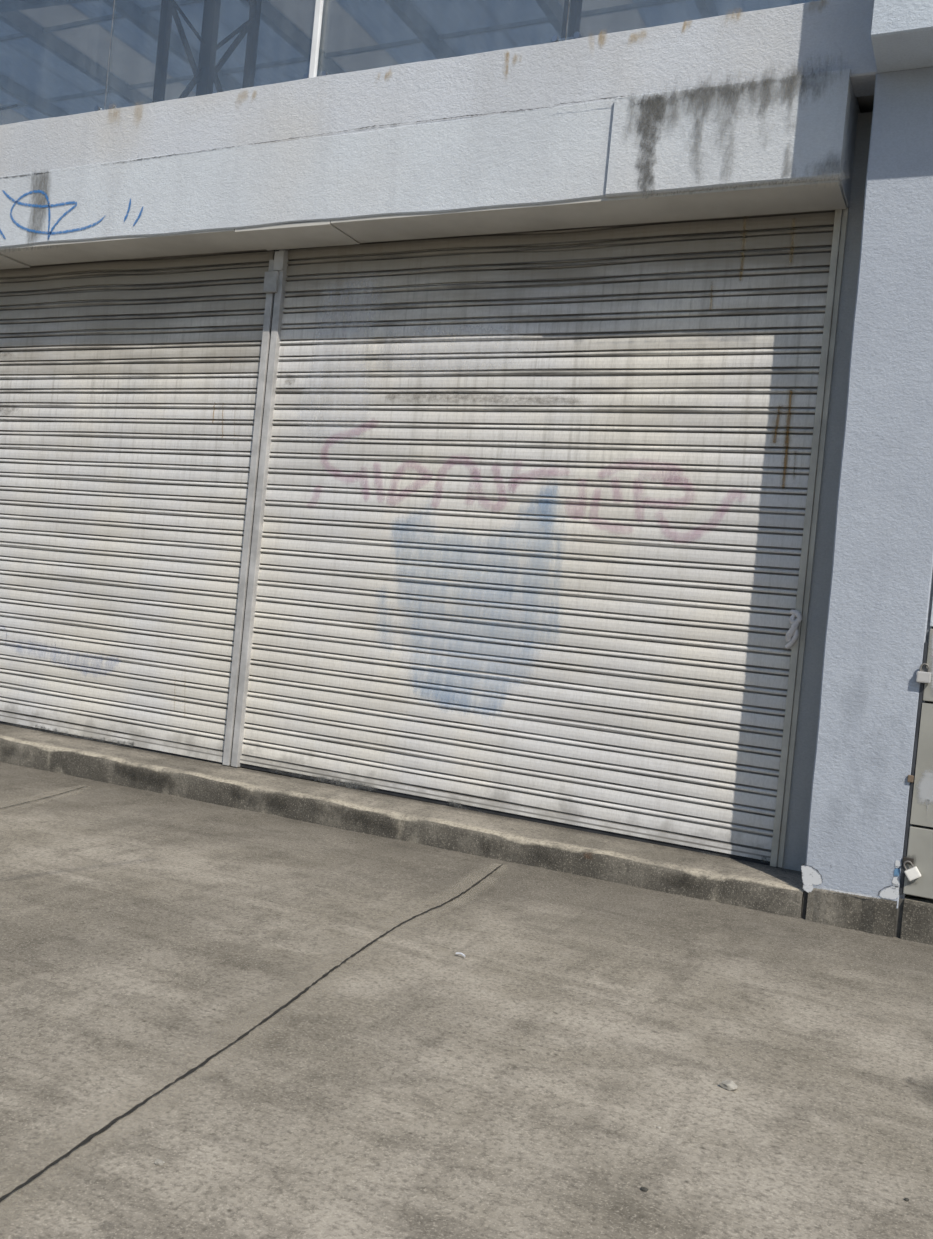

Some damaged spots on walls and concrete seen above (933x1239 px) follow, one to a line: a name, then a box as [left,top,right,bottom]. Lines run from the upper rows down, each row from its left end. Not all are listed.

damp [637,72,806,195]
rust [774,391,792,485]
peeling [801,860,900,900]